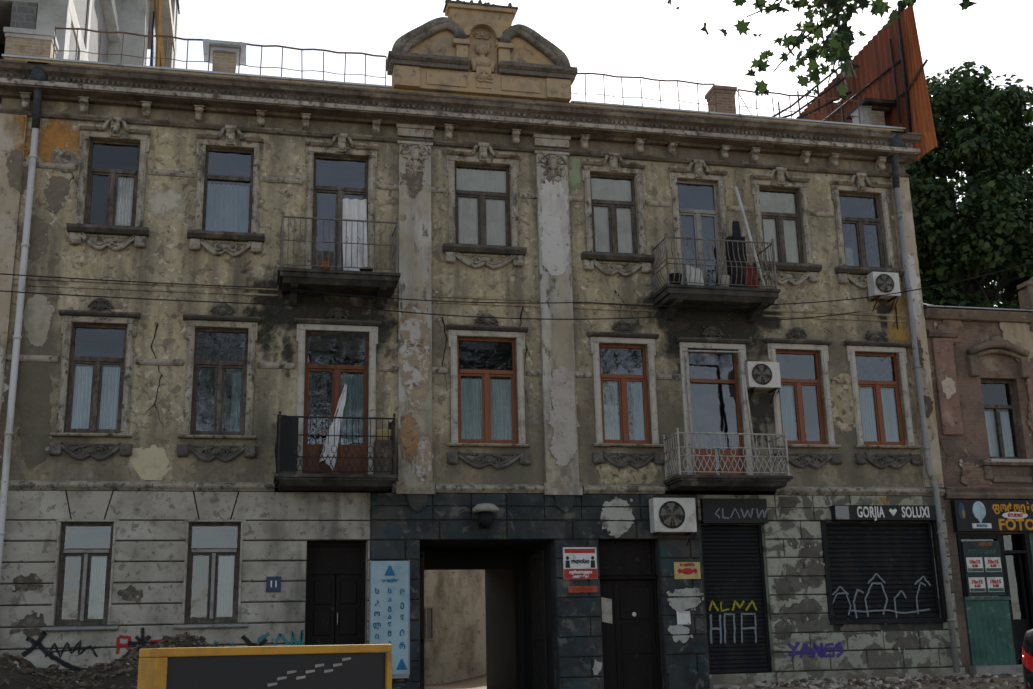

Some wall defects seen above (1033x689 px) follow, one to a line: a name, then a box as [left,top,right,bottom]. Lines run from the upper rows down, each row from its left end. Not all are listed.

peeling [0,346,9,403]
crack [145,324,172,428]
peeling [397,306,434,481]
peeling [548,361,580,470]
peeling [916,375,956,418]
flaking render [596,455,662,484]
peeling [600,497,635,538]
flaking render [11,573,43,598]
peeling [666,588,704,643]
peeling [772,537,825,644]
peeling [840,623,886,639]